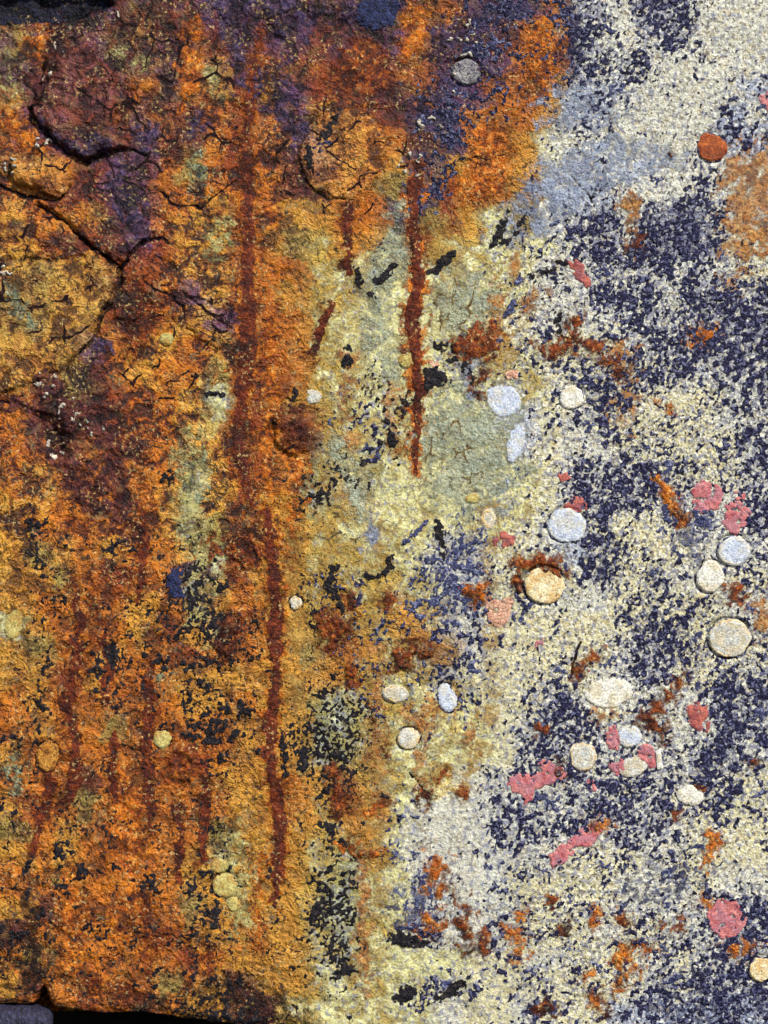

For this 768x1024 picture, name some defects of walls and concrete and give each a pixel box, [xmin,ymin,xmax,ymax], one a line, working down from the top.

crack [0,62,235,399]
crack [118,18,235,89]
corrosion [710,134,768,298]
corrosion [0,0,583,1024]